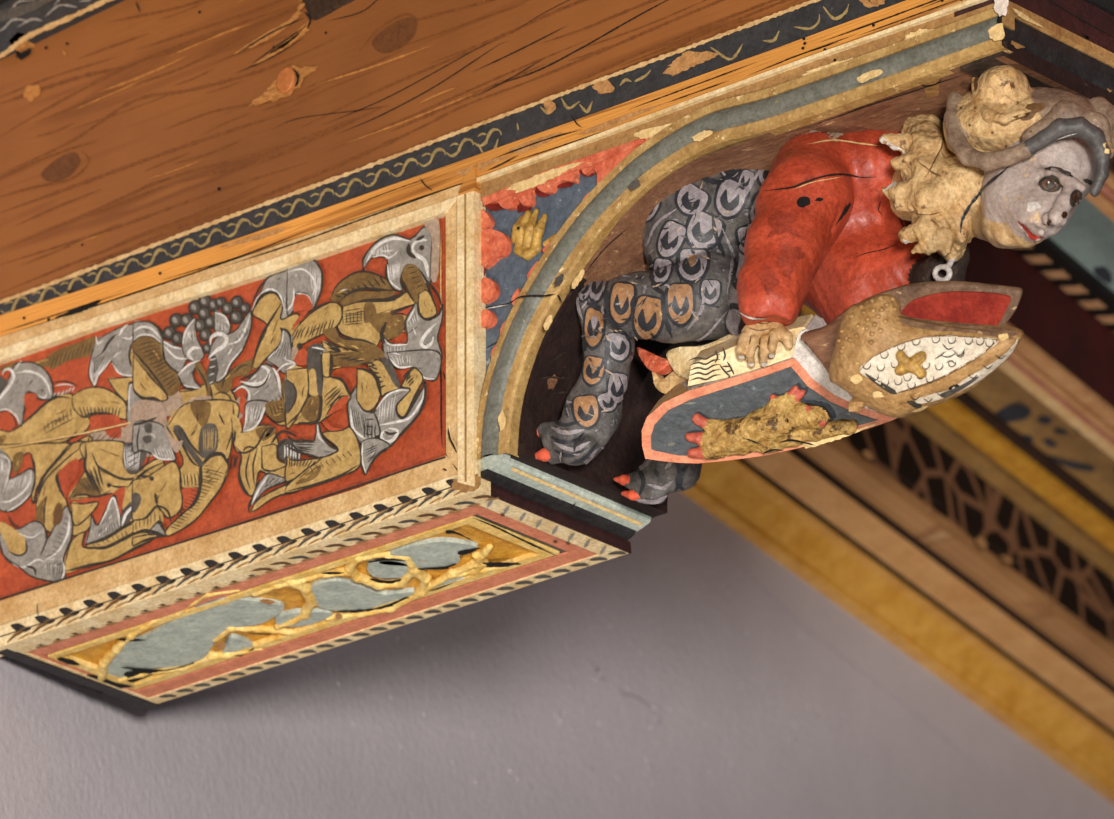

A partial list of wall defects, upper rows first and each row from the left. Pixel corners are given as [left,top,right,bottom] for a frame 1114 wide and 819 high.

peeling [859,0,885,8]
peeling [988,0,1044,49]
crack [237,0,377,72]
peeling [663,51,719,76]
peeling [592,80,614,94]
peeling [544,100,556,114]
crack [485,294,562,308]